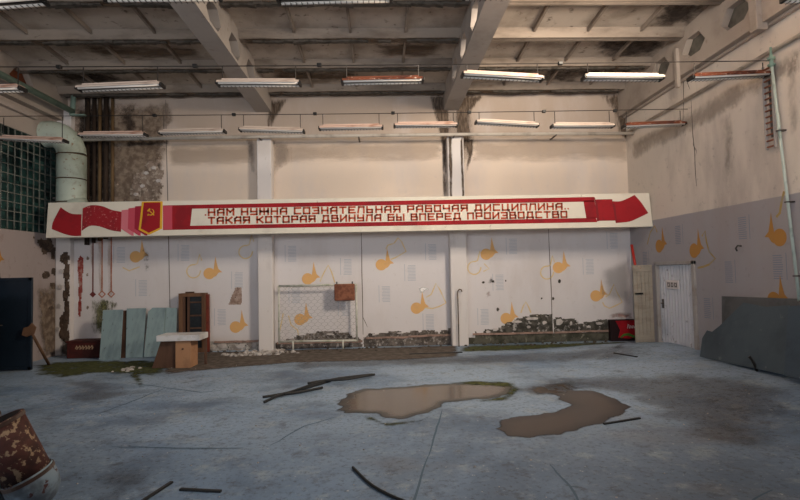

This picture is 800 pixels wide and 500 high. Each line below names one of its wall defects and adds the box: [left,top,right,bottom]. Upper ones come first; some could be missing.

damp [27,69,224,84]
mould [600,41,661,56]
mould [658,5,706,24]
damp [64,92,243,202]
damp [257,66,645,196]
crack [683,82,697,186]
peeling [33,236,89,341]
spalling [469,314,609,344]
crack [413,411,442,500]